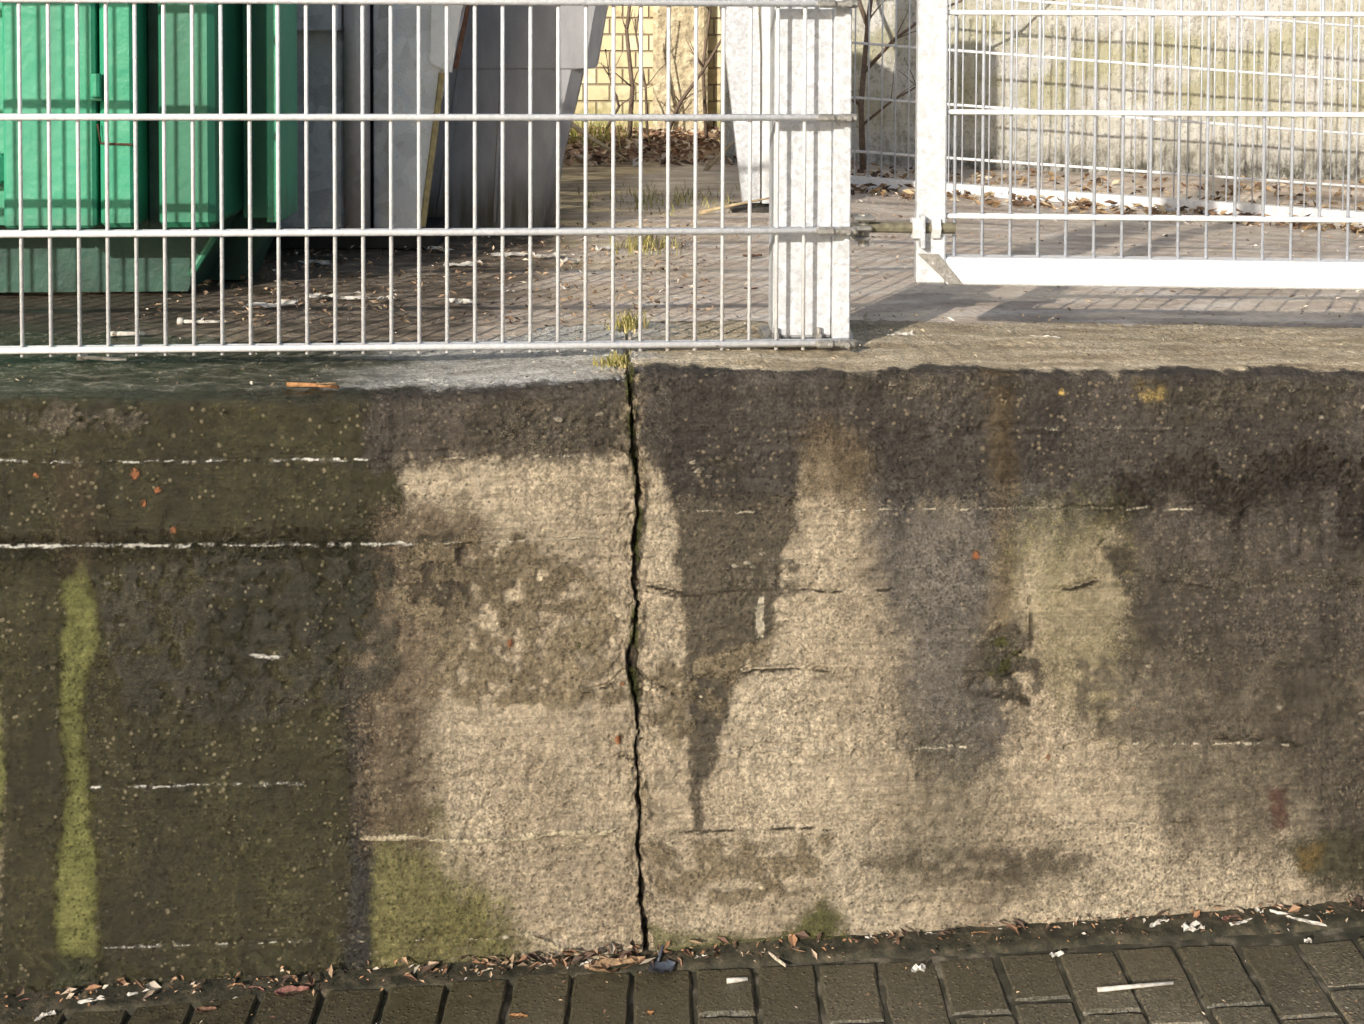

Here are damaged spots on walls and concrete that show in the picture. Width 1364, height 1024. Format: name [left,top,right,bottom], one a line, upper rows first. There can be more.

water stain [0,386,525,994]
crack [582,362,841,951]
water stain [625,362,1364,892]